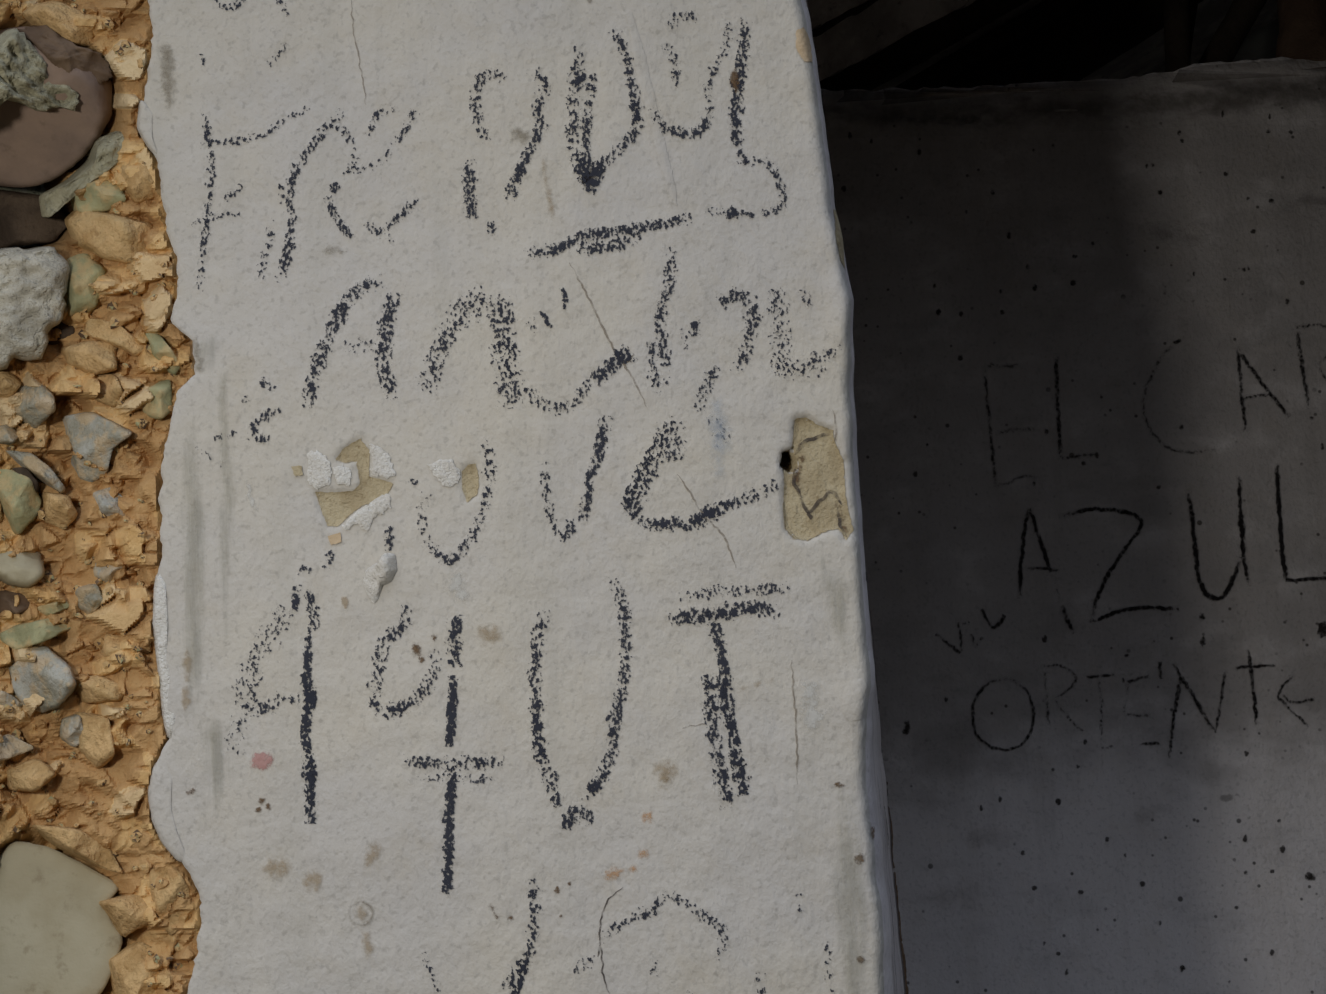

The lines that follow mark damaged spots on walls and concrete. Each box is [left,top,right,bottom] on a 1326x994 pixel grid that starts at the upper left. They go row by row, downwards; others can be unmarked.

spalling [0,0,202,994]
peeling [291,439,396,545]
peeling [781,417,854,541]
rust [886,782,909,994]